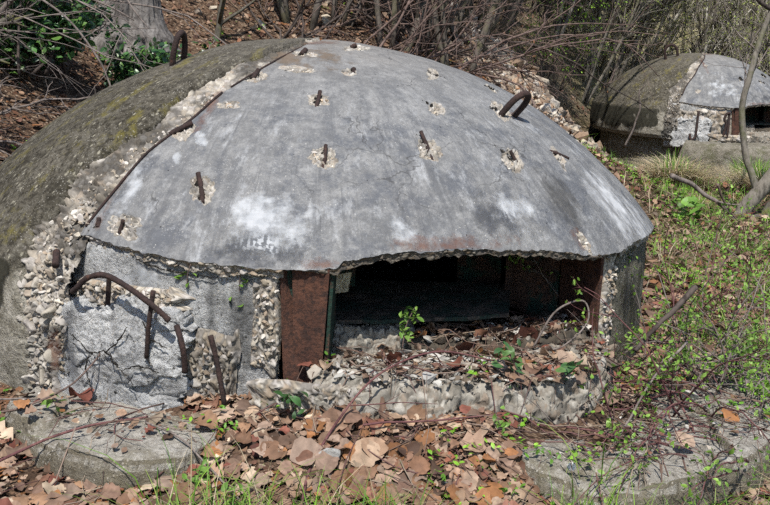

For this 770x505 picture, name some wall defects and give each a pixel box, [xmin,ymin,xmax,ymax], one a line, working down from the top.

spalling [661,52,752,143]
spalling [16,37,408,420]
crack [72,321,167,390]